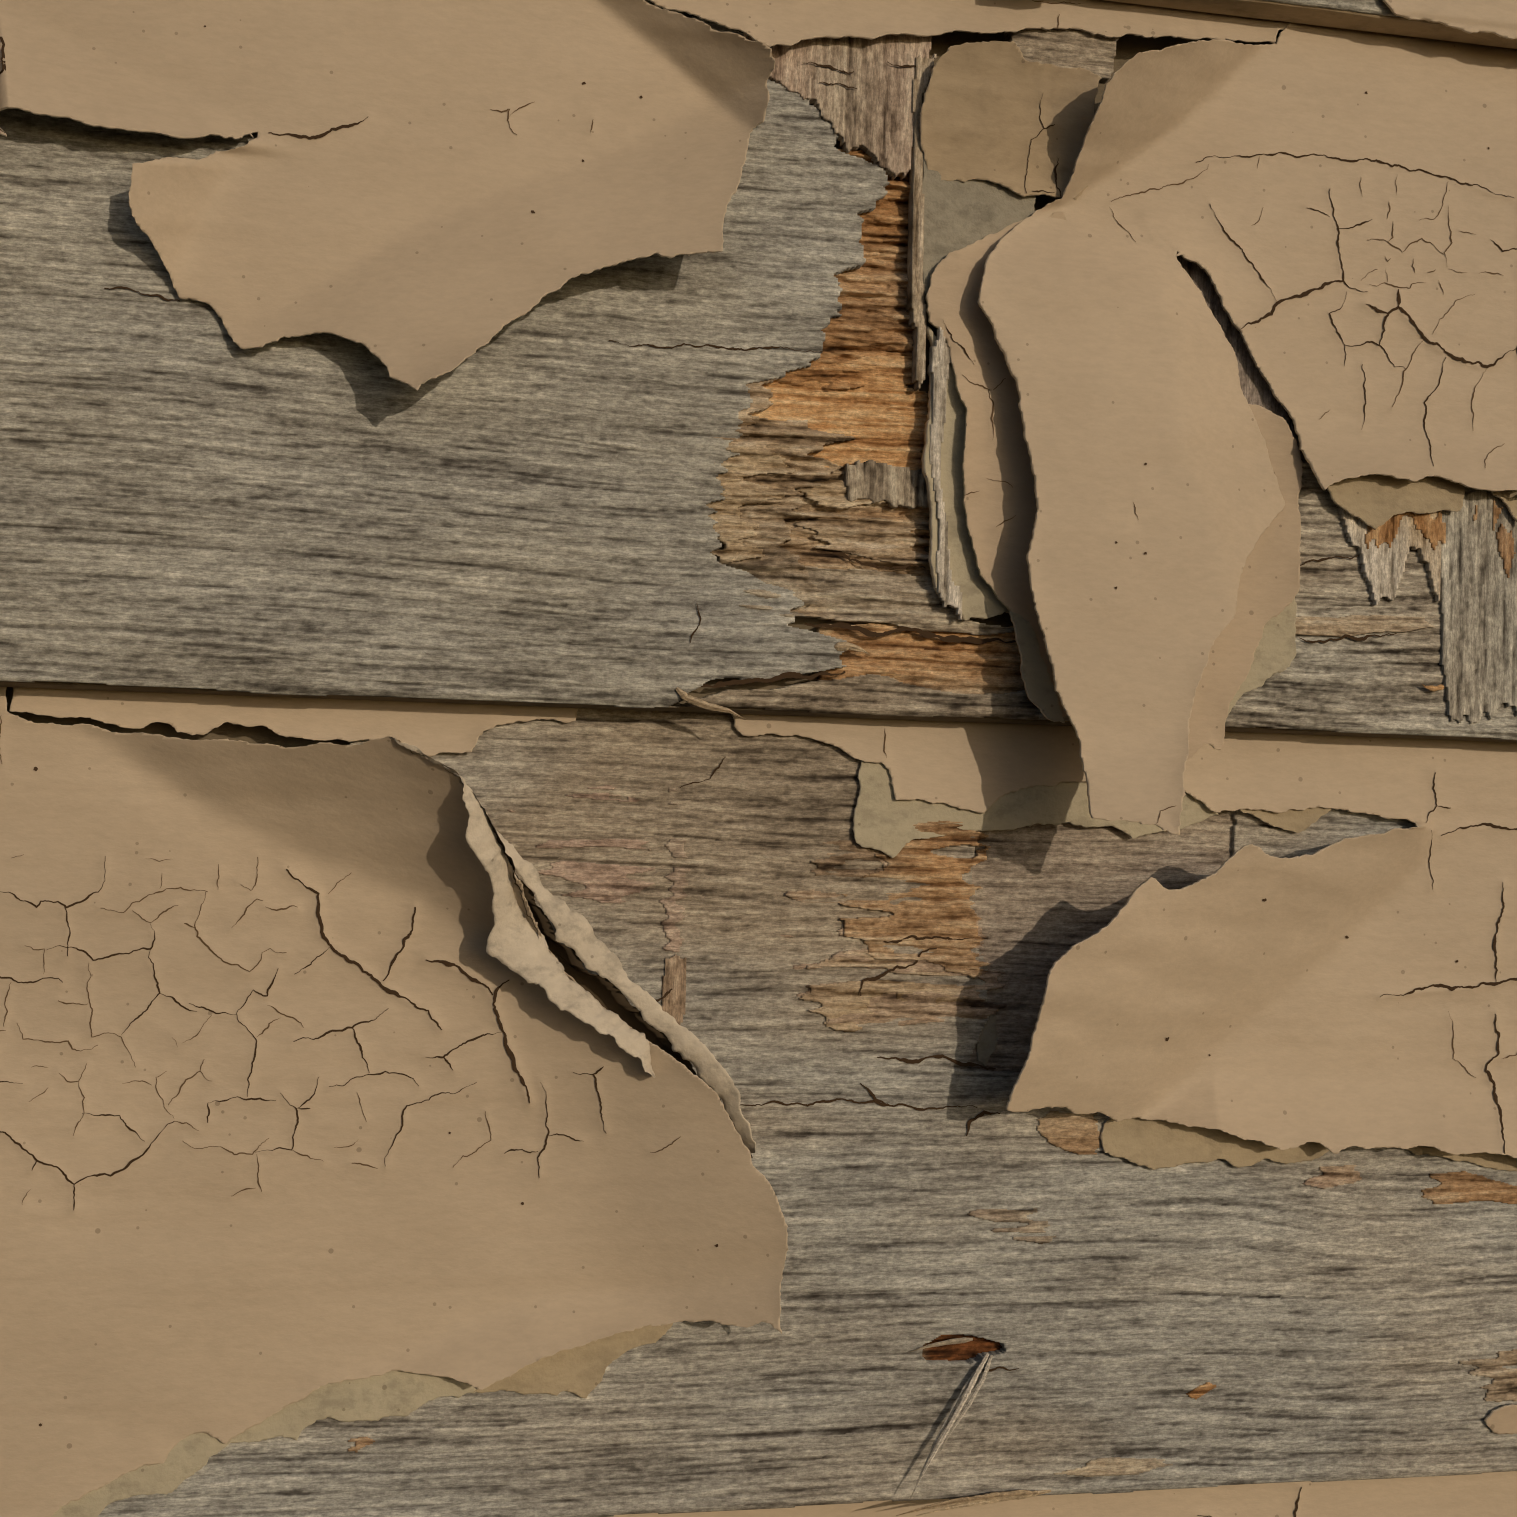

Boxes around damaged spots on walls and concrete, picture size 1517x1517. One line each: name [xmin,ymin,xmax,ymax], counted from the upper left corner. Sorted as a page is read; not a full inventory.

crack [0,36,8,74]
crack [1110,152,1517,466]
peeling [0,0,1517,1073]
crack [0,854,606,1210]
peeling [0,687,1517,1517]
crack [1380,888,1517,1153]